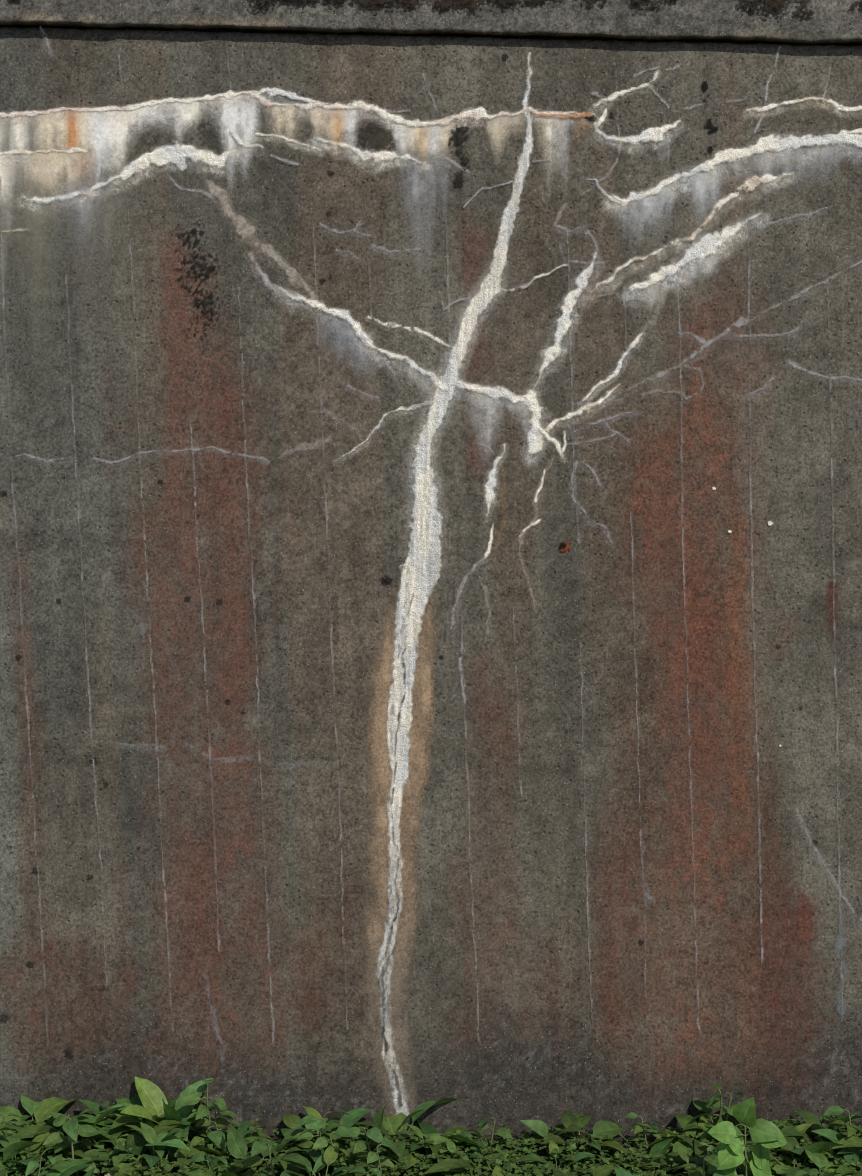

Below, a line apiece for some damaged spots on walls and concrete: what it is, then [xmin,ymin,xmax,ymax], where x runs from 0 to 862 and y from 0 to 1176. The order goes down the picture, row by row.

water stain [0,46,862,300]
crack [170,53,862,1128]
water stain [366,607,433,1124]